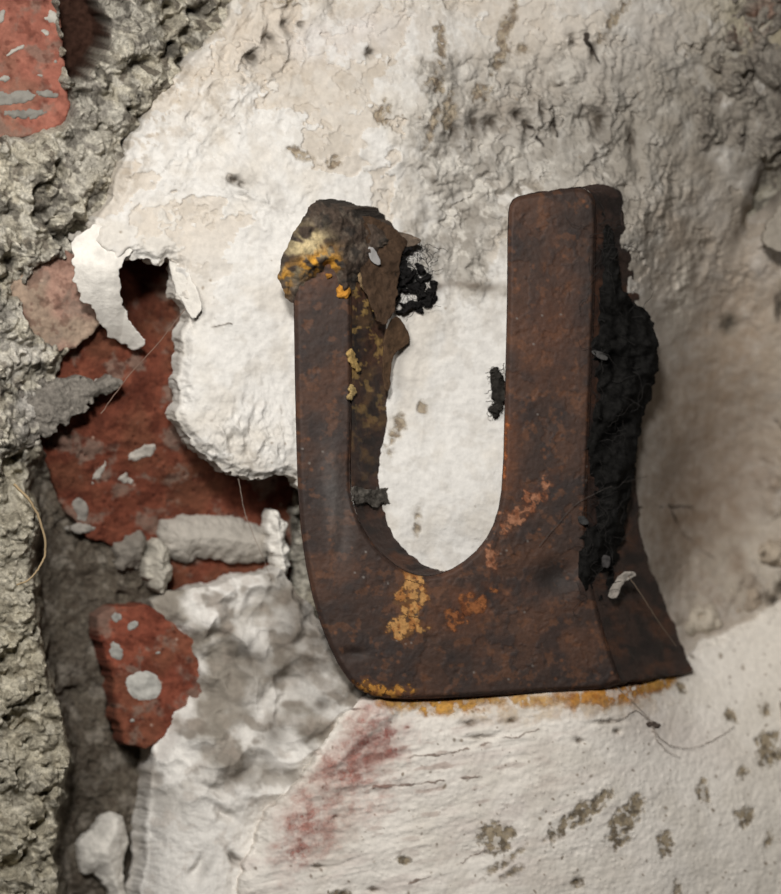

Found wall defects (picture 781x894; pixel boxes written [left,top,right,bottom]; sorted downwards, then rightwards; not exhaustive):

spalling [0,0,71,138]
peeling [761,204,781,252]
spalling [10,224,296,547]
rust [498,475,550,535]
spalling [166,557,270,591]
rust [485,544,497,570]
rust [386,572,430,640]
rust [445,588,498,632]
spalling [89,602,202,749]
rust [352,676,676,716]